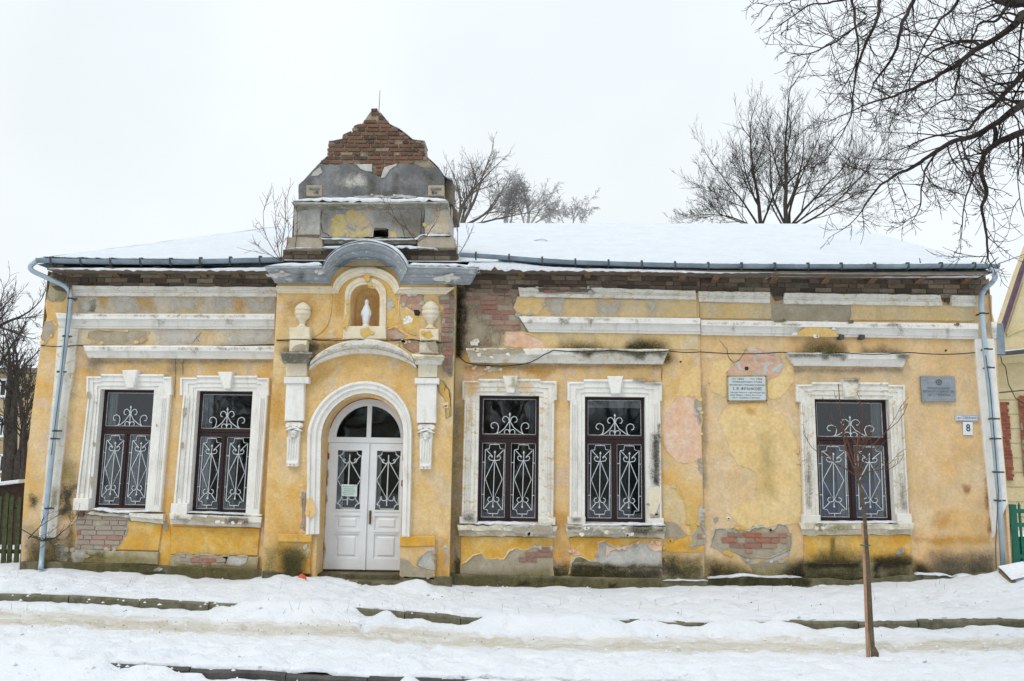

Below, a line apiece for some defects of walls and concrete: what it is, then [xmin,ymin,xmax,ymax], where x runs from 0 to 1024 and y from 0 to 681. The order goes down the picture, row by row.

flaking render [342,273,595,419]
peeling [568,347,802,578]
flaking render [54,510,130,562]
flaking render [400,545,449,579]
flaking render [461,524,554,576]
water stain [718,565,810,585]
water stain [929,556,991,575]